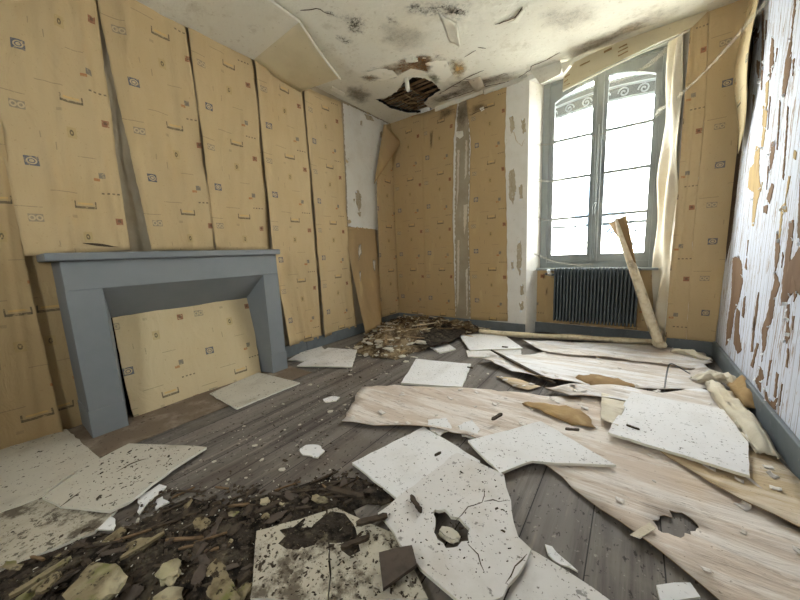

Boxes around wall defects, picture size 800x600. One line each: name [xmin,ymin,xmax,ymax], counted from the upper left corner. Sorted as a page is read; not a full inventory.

spalling [366,68,410,92]
damp [387,57,431,74]
spalling [403,54,452,82]
spalling [509,115,526,134]
spalling [508,169,523,204]
peeling [726,0,800,410]
peeling [456,131,468,316]
spalling [511,241,524,312]